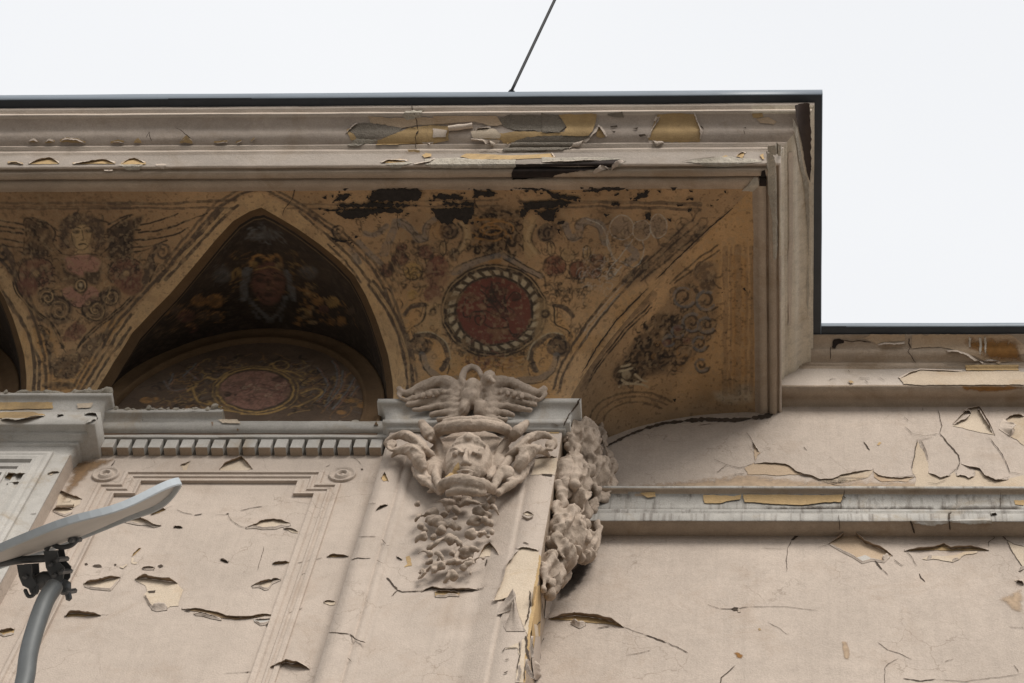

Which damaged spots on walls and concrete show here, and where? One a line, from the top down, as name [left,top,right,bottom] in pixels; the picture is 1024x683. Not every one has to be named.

peeling [7,157,59,165]
peeling [73,157,166,171]
spalling [318,110,703,234]
spalling [898,365,1024,392]
peeling [703,406,1024,505]
peeling [53,490,82,517]
peeling [245,518,298,533]
peeling [820,532,1024,574]
peeling [83,547,183,612]
peeling [251,578,281,590]
spalling [479,542,624,683]